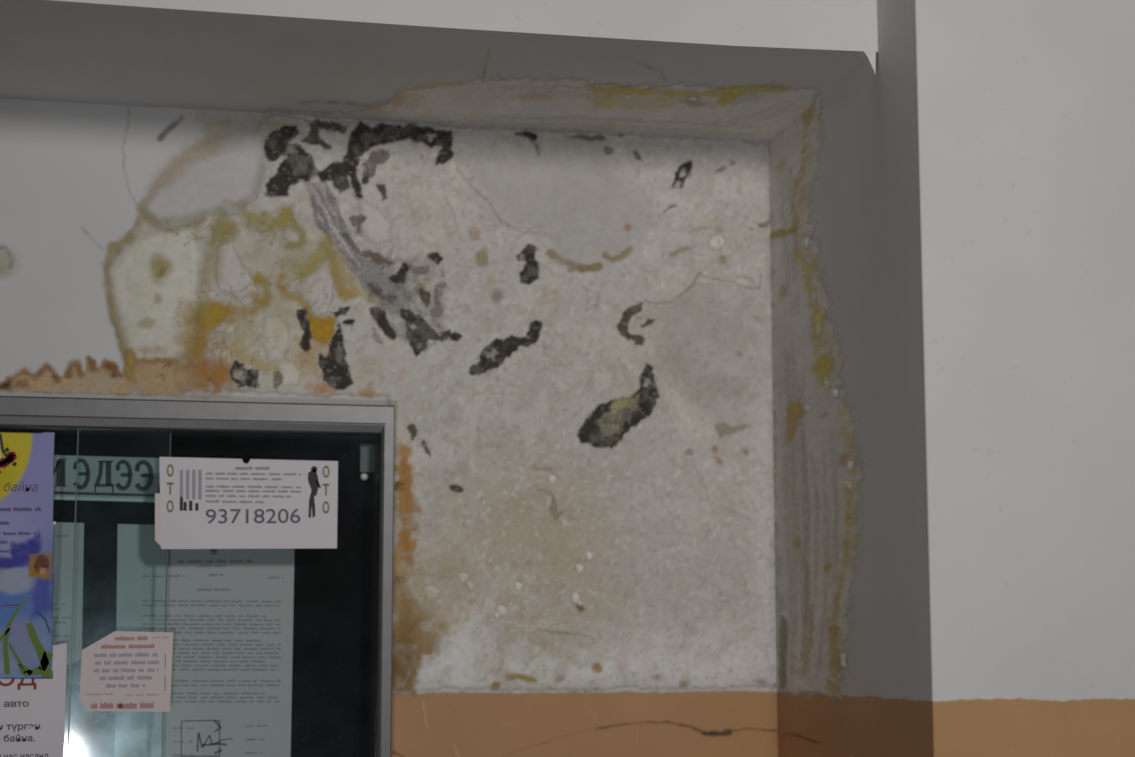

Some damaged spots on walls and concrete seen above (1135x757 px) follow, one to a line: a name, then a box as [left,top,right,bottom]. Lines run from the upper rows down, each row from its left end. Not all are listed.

damp [591,85,782,108]
damp [571,134,623,154]
damp [672,161,692,188]
damp [751,217,798,238]
damp [152,258,168,278]
damp [104,237,128,363]
damp [617,303,654,345]
damp [795,253,834,383]
peeling [108,76,864,699]
damp [578,364,659,448]
crack [668,721,732,736]